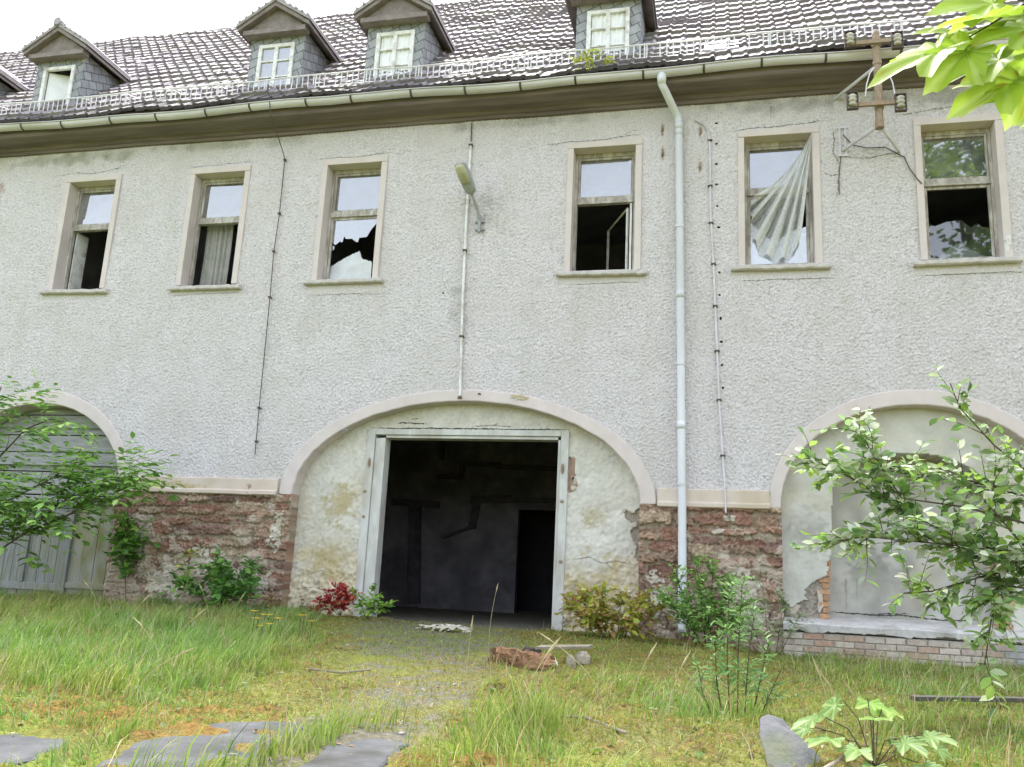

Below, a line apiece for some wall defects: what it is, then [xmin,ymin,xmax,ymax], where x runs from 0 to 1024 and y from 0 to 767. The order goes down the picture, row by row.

crack [729,120,892,199]
flaking render [266,511,284,554]
spalling [621,508,640,563]
flaking render [140,544,273,605]
crack [574,557,632,571]
flaking render [645,569,669,621]